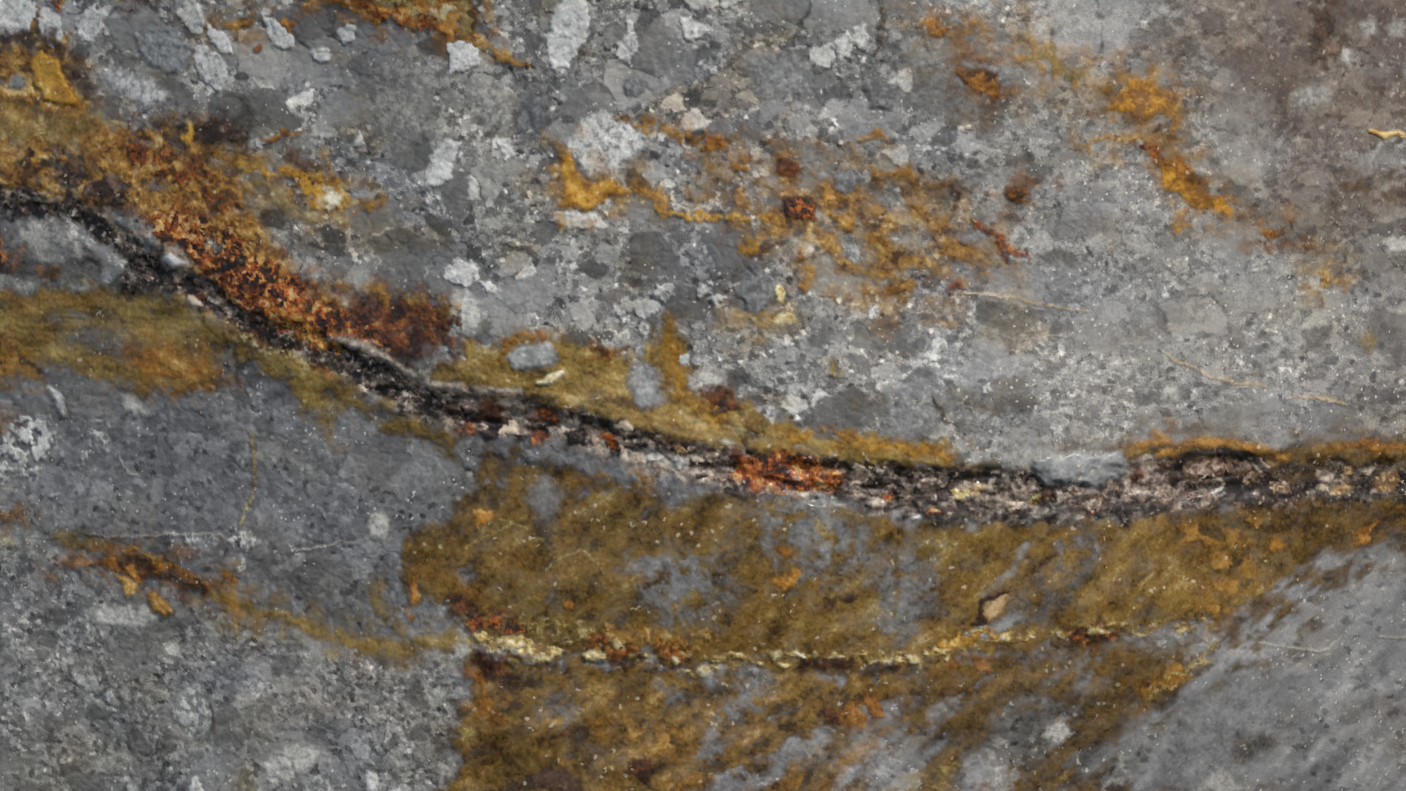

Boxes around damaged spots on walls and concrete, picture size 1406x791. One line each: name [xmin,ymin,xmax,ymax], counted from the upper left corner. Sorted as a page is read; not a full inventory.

corrosion [0,20,462,363]
corrosion [550,115,1030,302]
corrosion [1085,69,1236,231]
leakage [0,286,456,459]
crack [0,184,1406,538]
corrosion [51,531,473,660]
crack [297,540,363,551]
leakage [767,709,857,791]
crack [424,572,1204,679]
leakage [907,691,1015,791]
corrosion [928,617,1215,731]
leakage [1007,673,1145,791]